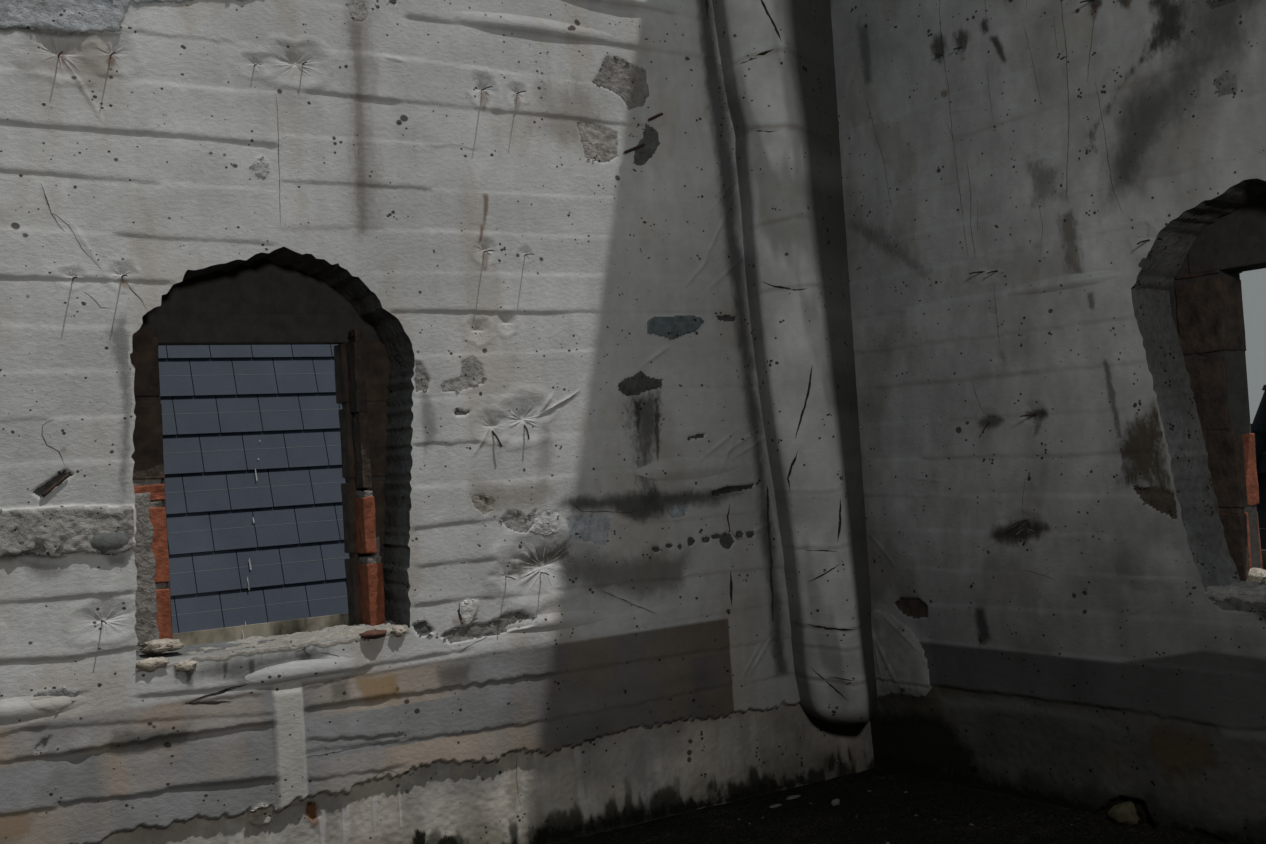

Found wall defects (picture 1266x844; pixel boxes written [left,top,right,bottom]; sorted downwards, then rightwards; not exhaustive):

peeling [0,0,193,35]
crack [738,0,782,65]
spalling [592,56,649,110]
water stain [1117,0,1252,179]
spalling [577,121,619,163]
spalling [634,123,660,166]
spalling [0,470,135,558]
spalling [1133,485,1177,519]